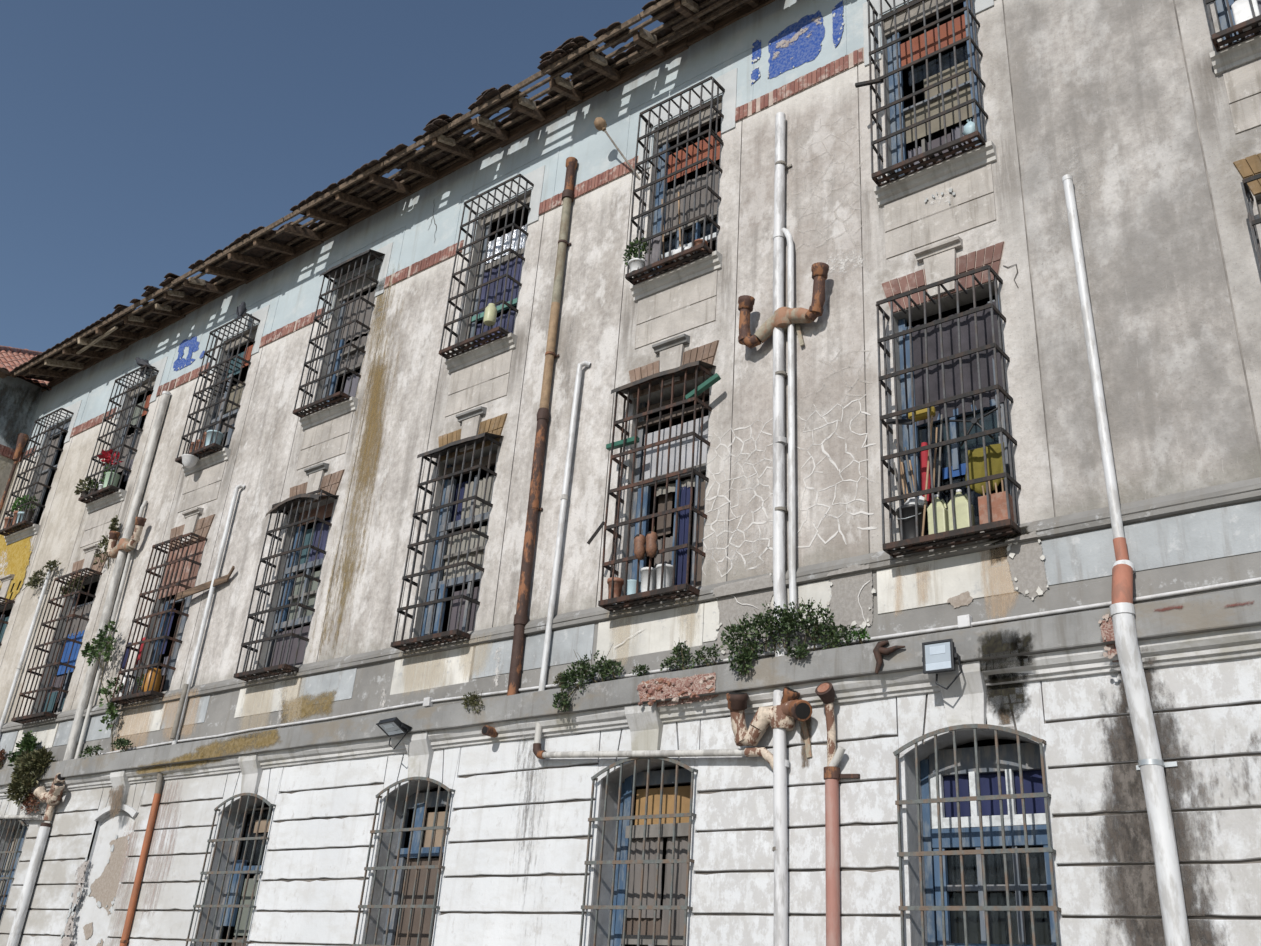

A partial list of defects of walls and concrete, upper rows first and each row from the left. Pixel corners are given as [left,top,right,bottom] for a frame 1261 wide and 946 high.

peeling [750,0,845,85]
damp [0,385,40,445]
damp [320,279,391,647]
crack [701,394,876,608]
peeling [1004,531,1049,600]
flaking render [637,672,719,707]
damp [979,631,1033,728]
damp [1096,671,1166,946]
damp [1143,657,1217,946]
peeling [60,834,131,946]